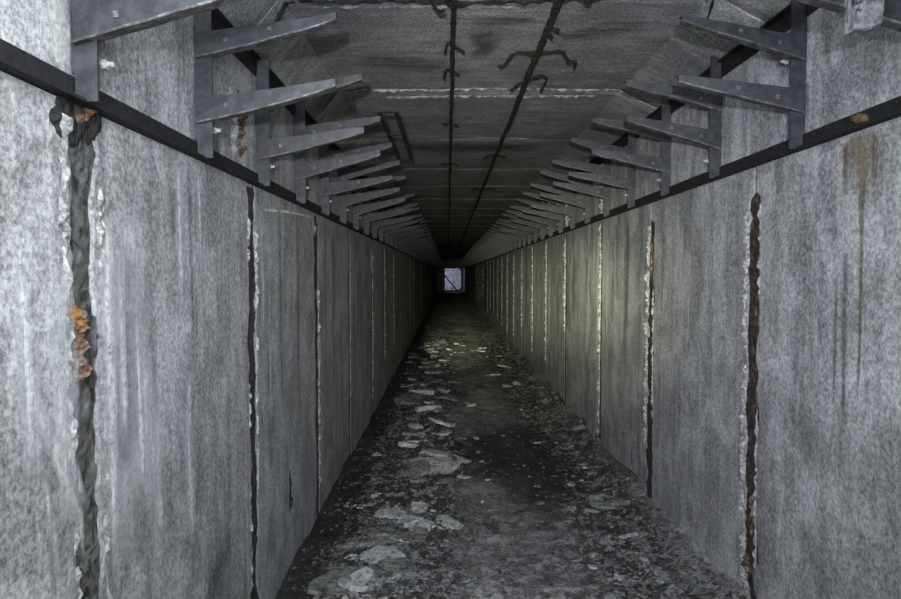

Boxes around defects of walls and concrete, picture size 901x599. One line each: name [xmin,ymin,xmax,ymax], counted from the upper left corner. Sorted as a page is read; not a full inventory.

spalling [49,89,102,465]
rust [65,305,99,388]
rust [844,138,874,372]